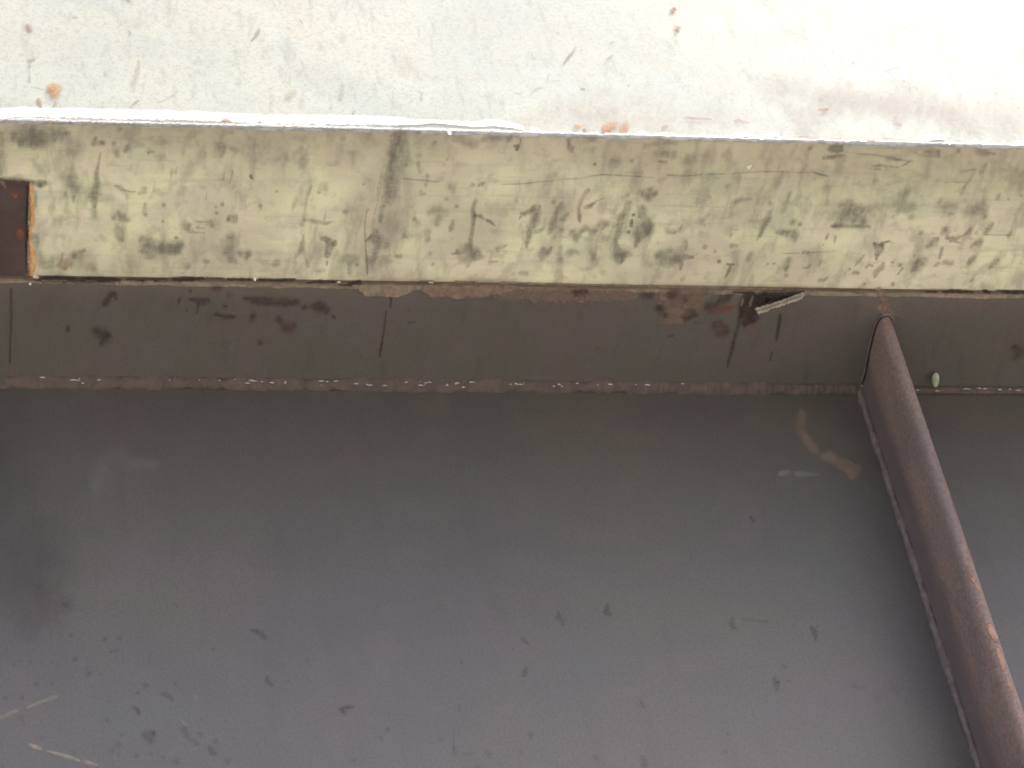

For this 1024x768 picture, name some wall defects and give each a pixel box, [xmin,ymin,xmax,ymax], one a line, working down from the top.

peeling [337,279,783,299]